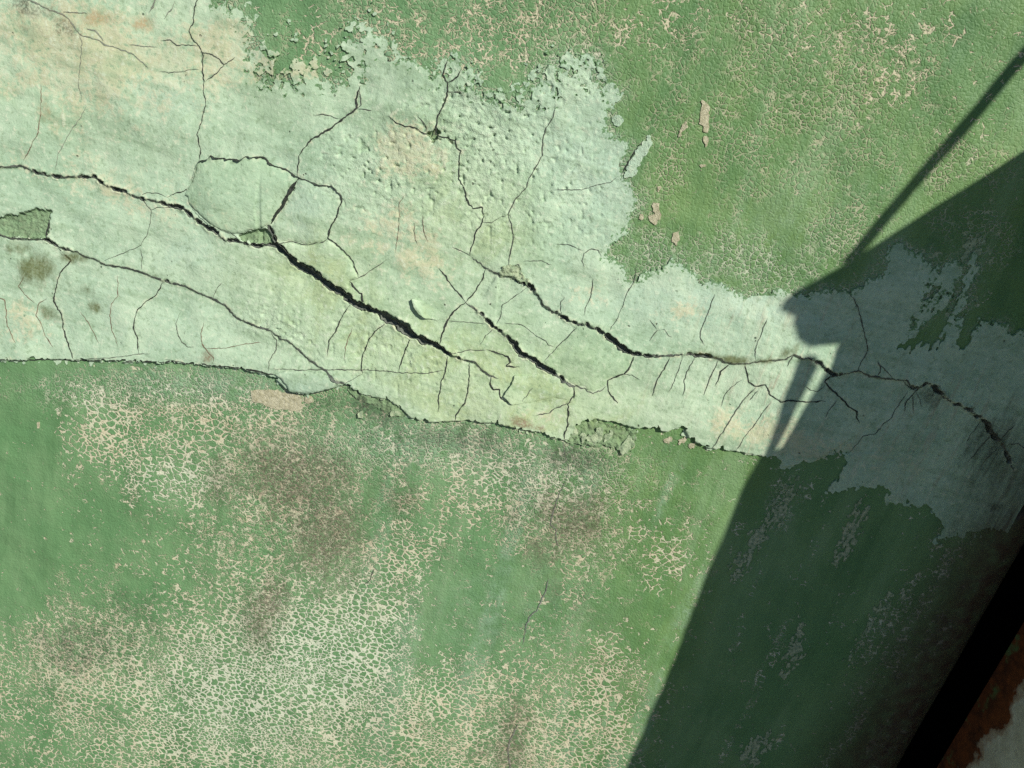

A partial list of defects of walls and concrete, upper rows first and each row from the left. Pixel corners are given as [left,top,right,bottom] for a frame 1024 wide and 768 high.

crack [0,0,1024,544]
peeling [0,0,1024,585]
peeling [735,728,775,768]